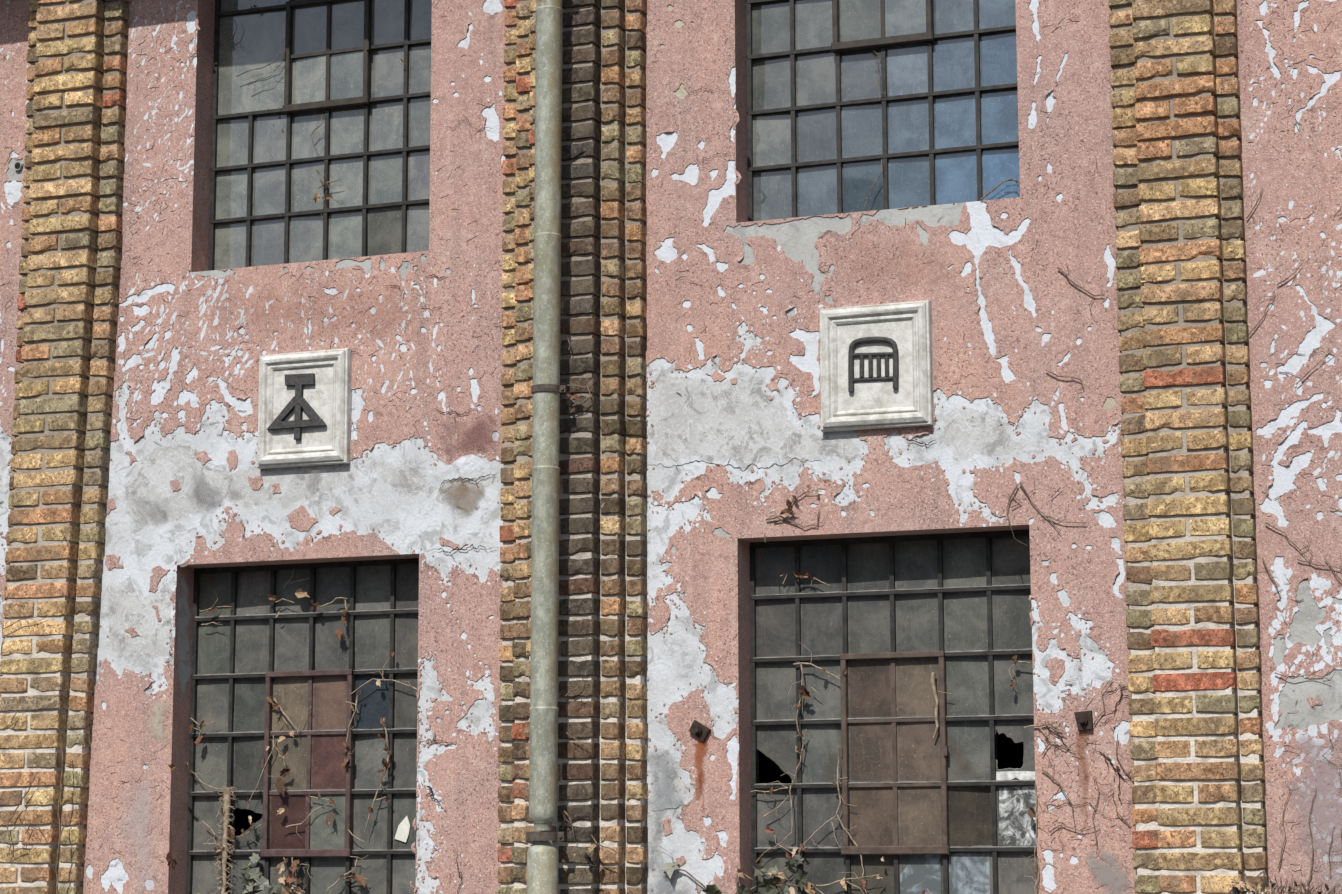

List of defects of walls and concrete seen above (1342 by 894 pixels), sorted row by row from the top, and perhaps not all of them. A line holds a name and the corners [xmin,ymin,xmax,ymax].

peeling [728,67,739,142]
peeling [1255,0,1341,133]
peeling [189,269,237,279]
peeling [0,419,13,575]
peeling [94,283,503,703]
crack [659,458,817,472]
peeling [644,127,1125,894]
peeling [1252,284,1342,527]
flaking render [1272,556,1342,730]
peeling [410,651,498,894]
corrosion [696,742,705,796]
peeling [86,858,129,894]